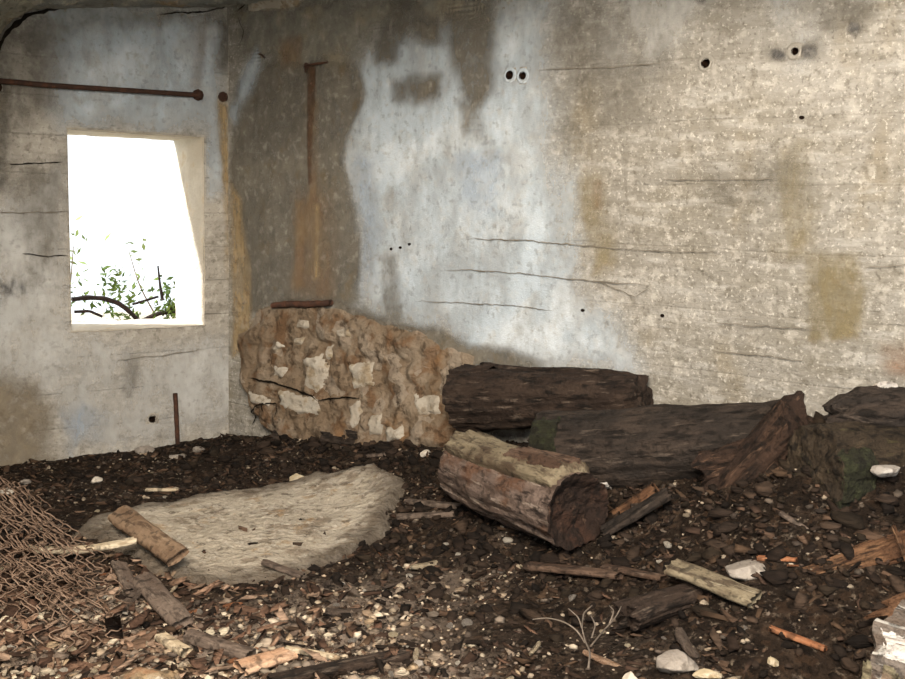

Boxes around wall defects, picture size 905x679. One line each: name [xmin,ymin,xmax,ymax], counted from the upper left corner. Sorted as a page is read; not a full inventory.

crack [0,8,58,50]
damp [53,7,228,127]
crack [156,5,245,43]
crack [0,208,65,216]
corrosion [219,103,250,354]
corrosion [307,66,315,196]
damp [212,0,625,367]
crack [251,378,357,426]